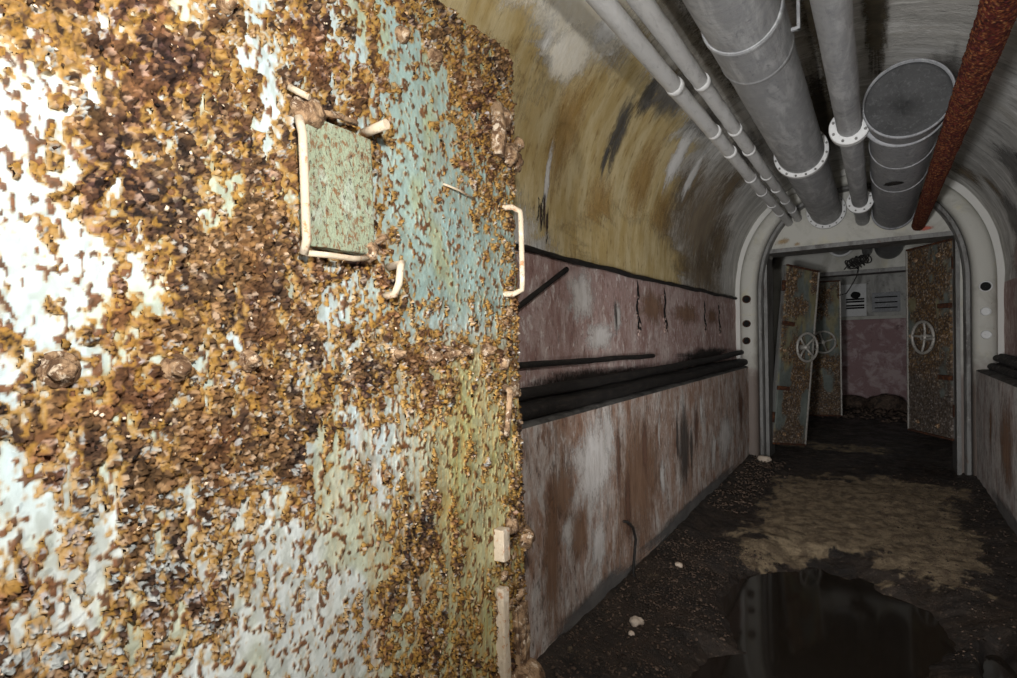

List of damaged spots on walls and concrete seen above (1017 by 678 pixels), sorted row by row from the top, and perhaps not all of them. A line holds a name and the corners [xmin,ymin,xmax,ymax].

water stain [439,0,744,293]
rust [0,0,528,678]
water stain [569,274,621,350]
water stain [555,412,637,639]
water stain [647,406,733,547]